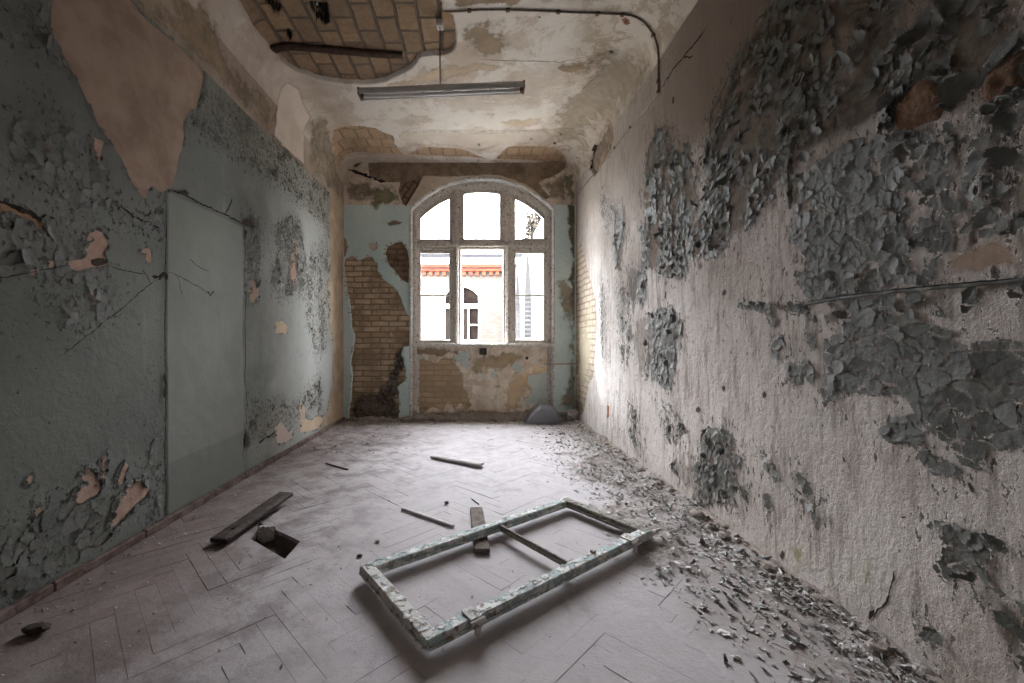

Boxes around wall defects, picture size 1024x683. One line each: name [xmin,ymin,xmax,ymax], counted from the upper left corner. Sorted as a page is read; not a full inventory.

crack [661,28,706,88]
peeling [0,0,471,446]
spalling [331,126,568,206]
peeling [576,0,1024,493]
crack [67,189,276,514]
peeling [0,431,164,602]
peeling [660,426,770,517]
peeling [926,520,1024,667]